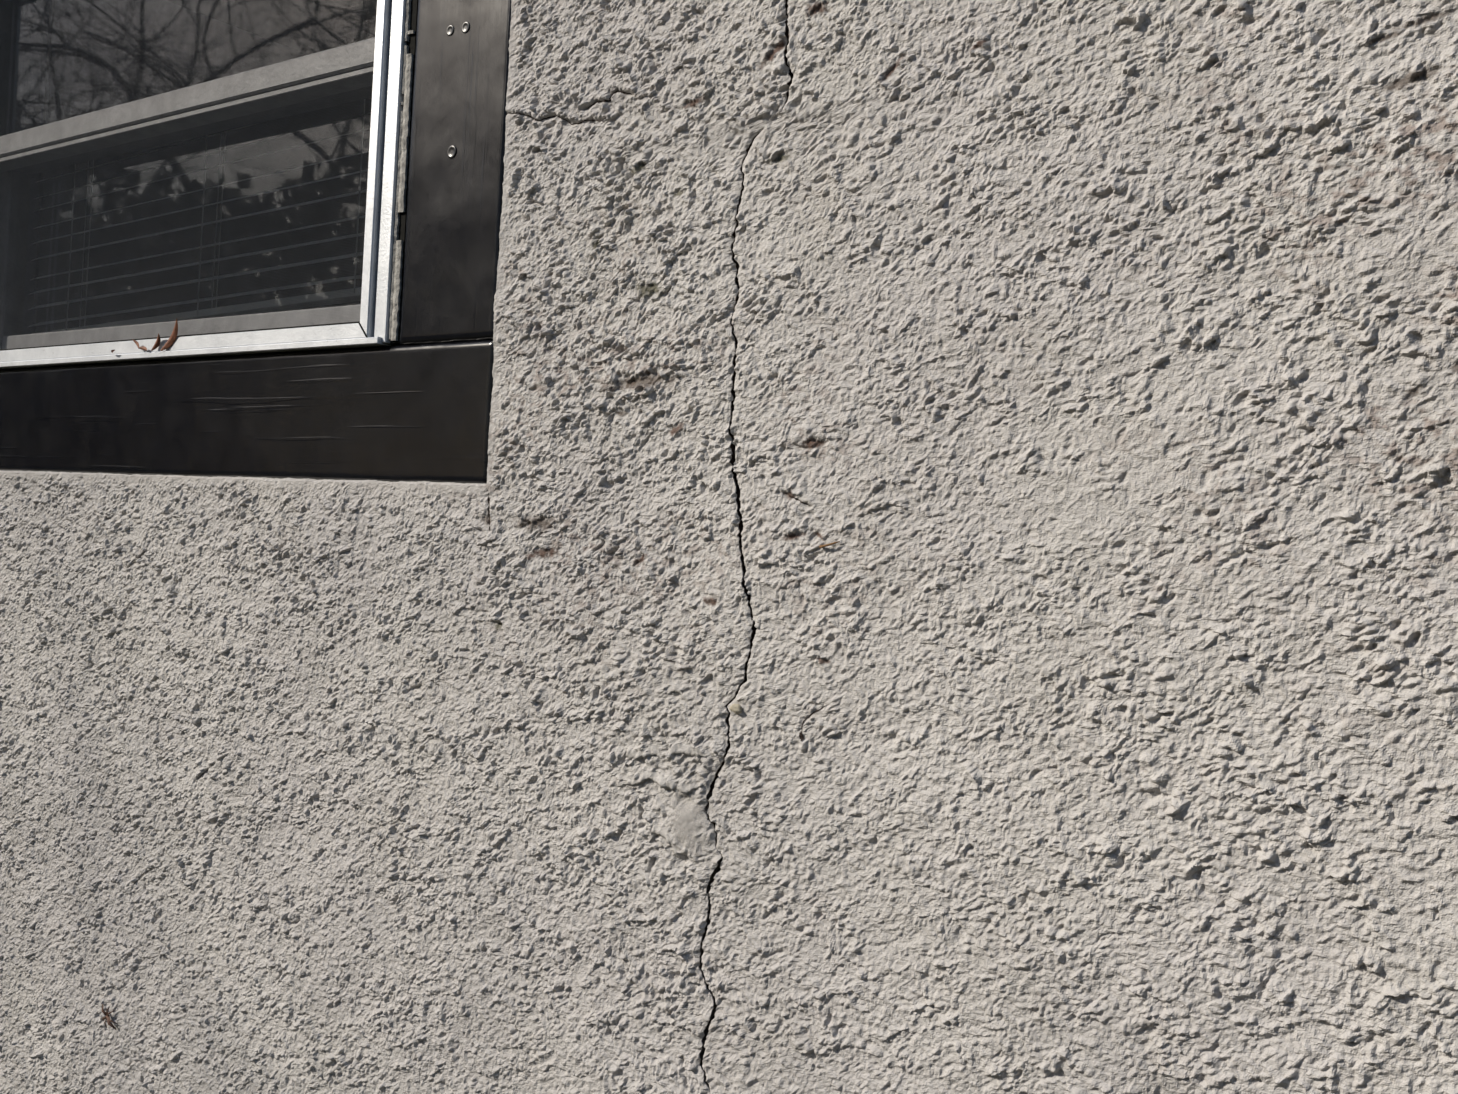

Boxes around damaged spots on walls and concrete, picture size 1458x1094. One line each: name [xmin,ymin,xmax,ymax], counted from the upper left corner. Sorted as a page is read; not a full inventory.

crack [699,0,794,1088]